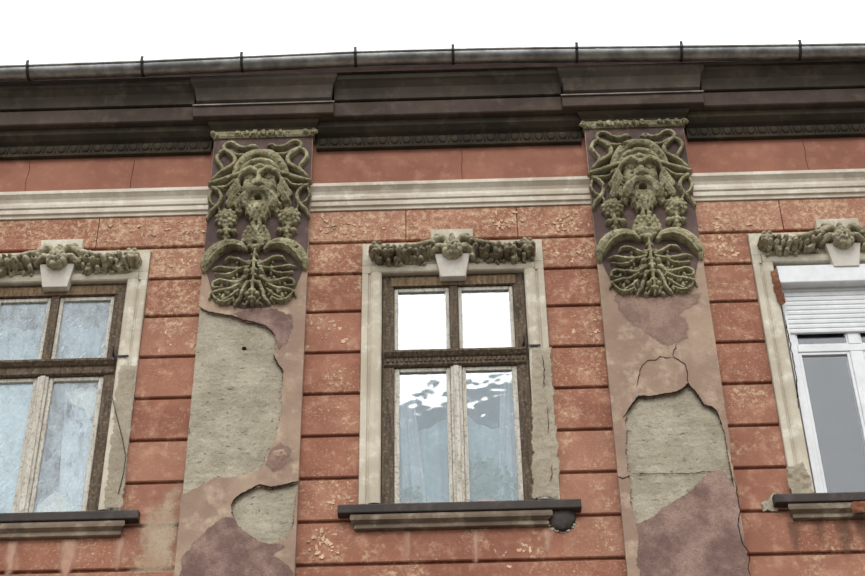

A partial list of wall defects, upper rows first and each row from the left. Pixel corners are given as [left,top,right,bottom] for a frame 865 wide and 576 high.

spalling [158,308,293,494]
crack [623,343,722,424]
peeling [179,484,298,576]